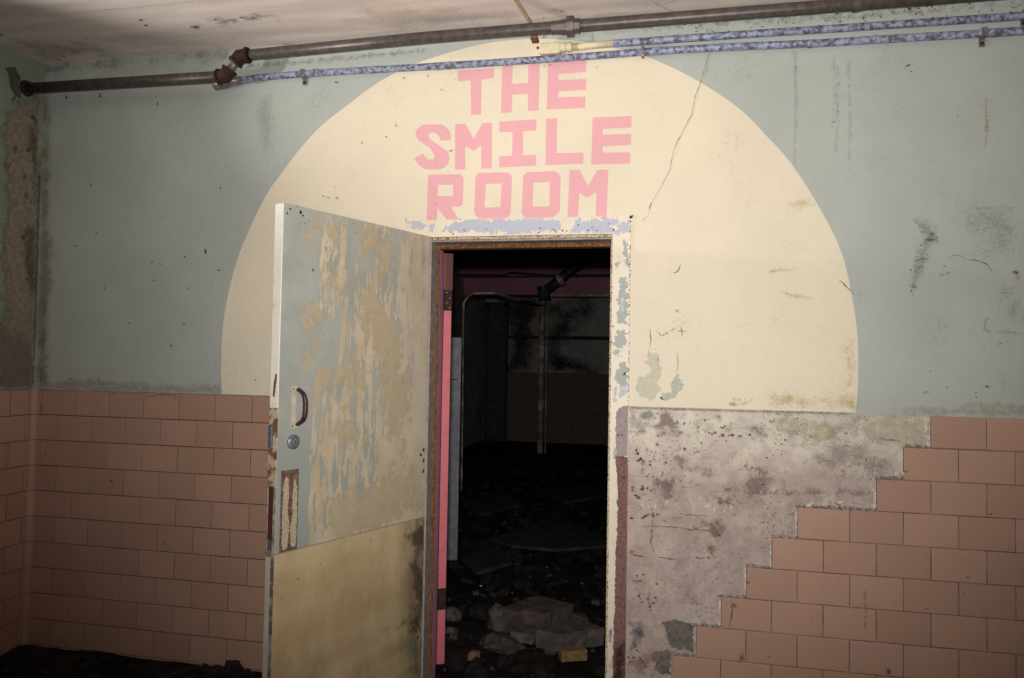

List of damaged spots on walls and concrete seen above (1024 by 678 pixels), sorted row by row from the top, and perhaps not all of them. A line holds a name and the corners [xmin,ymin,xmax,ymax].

crack [643,21,721,220]
spalling [407,217,928,678]